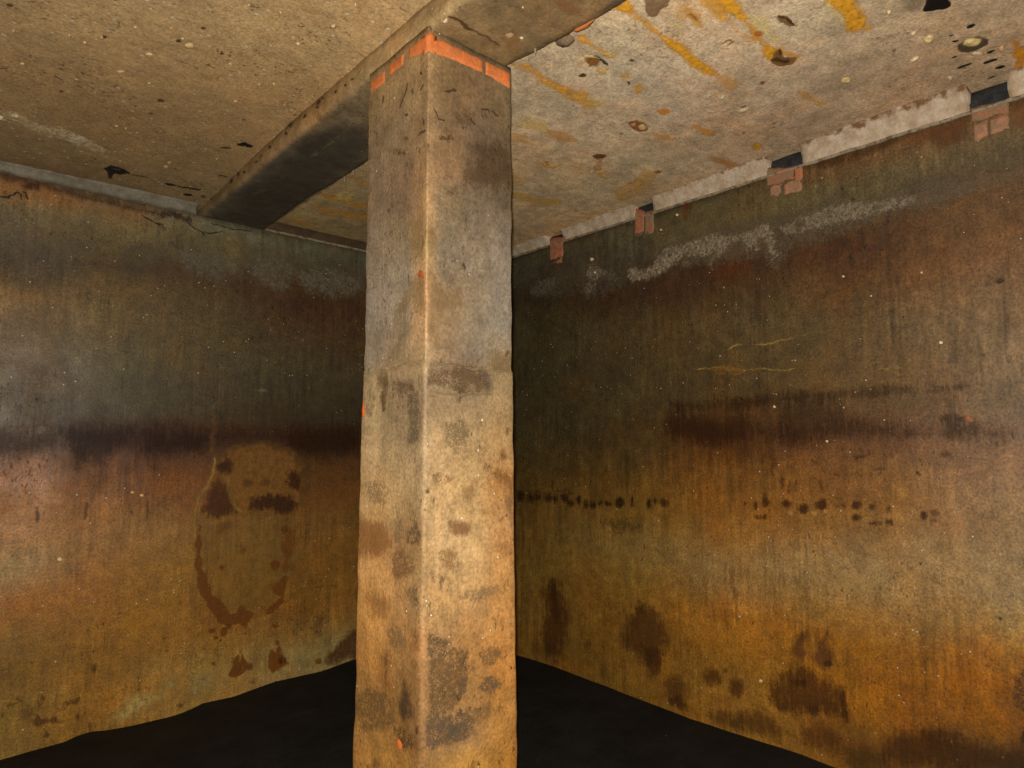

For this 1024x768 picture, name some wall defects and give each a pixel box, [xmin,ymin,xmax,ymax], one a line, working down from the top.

crack [448,7,500,46]
rust [612,0,798,89]
rust [823,0,871,32]
spalling [958,37,1005,56]
flaking render [970,101,1010,141]
flaking render [590,154,662,237]
flaking render [766,165,803,197]
crack [143,216,247,236]
water stain [628,172,1019,282]
water stain [517,483,633,508]
water stain [426,635,474,747]